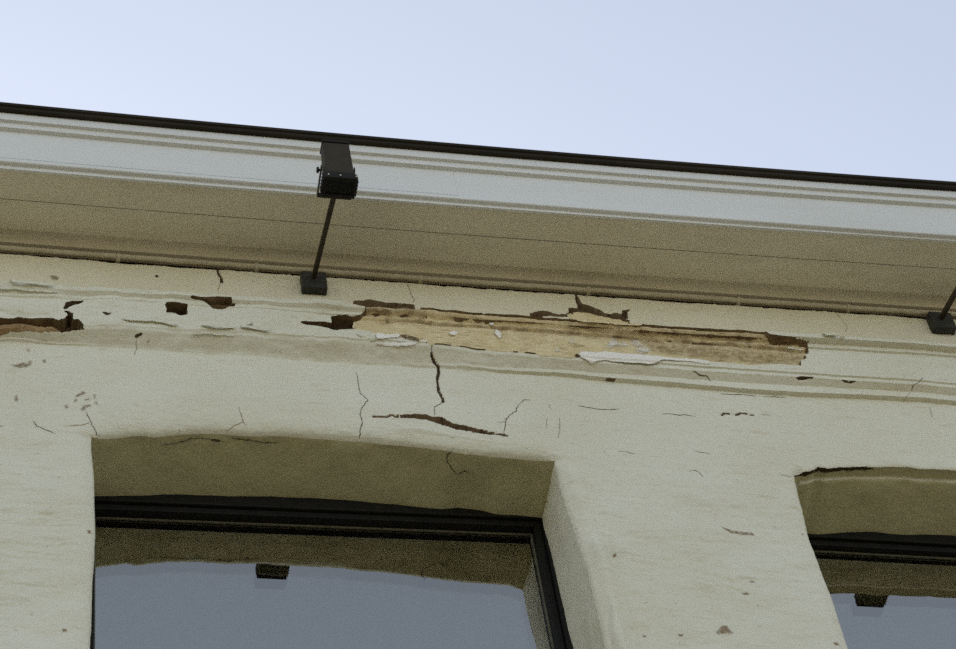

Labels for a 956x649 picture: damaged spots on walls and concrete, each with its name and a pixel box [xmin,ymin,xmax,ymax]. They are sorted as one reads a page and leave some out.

spalling [0,324,70,336]
spalling [331,305,806,365]
crack [431,346,443,412]
crack [164,409,271,445]
crack [780,466,873,477]